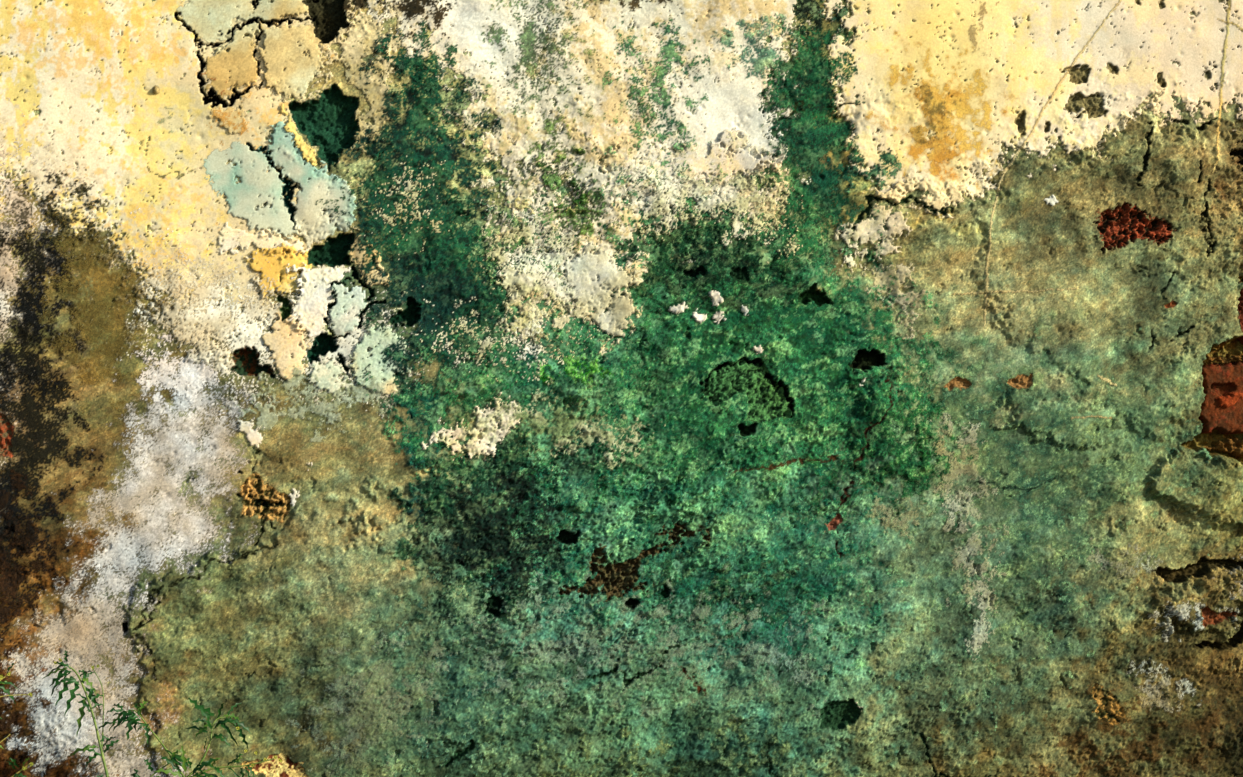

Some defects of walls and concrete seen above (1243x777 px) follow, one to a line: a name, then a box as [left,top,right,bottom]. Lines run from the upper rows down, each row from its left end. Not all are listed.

crack [174,0,319,108]
peeling [0,0,1243,469]
leakage [0,168,258,777]
spalling [239,472,300,523]
leakage [869,413,1009,655]
spalling [1201,606,1238,627]